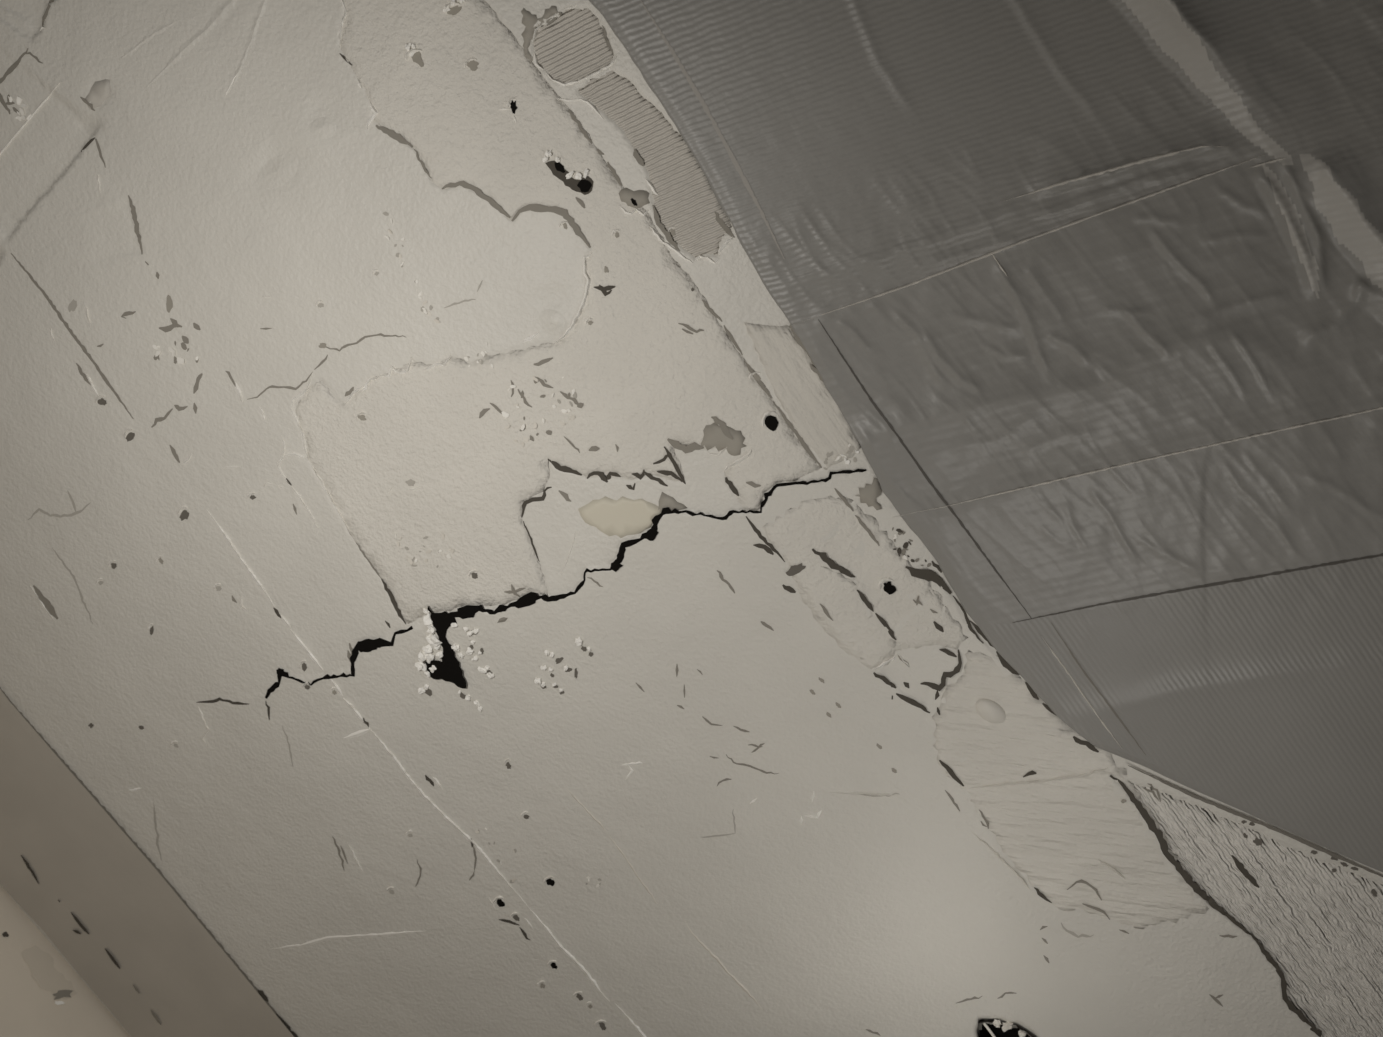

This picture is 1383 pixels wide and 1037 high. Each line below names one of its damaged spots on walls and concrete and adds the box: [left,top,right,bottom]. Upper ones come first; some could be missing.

flaking render [295,0,968,699]
crack [197,543,413,766]
crack [448,357,1322,1037]
crack [332,836,348,870]
flaking render [1121,783,1383,1037]